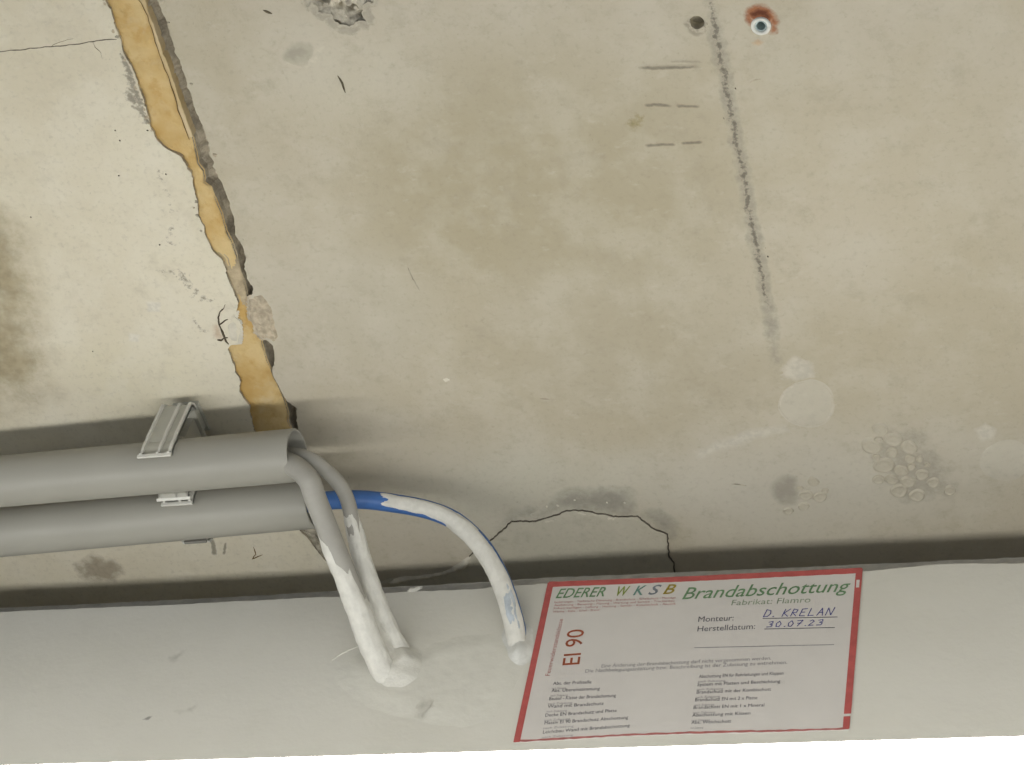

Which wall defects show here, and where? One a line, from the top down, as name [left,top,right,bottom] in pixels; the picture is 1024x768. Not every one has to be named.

spalling [299,0,379,36]
corrosion [742,3,781,47]
crack [0,0,298,432]
water stain [0,197,76,430]
crack [300,529,326,561]